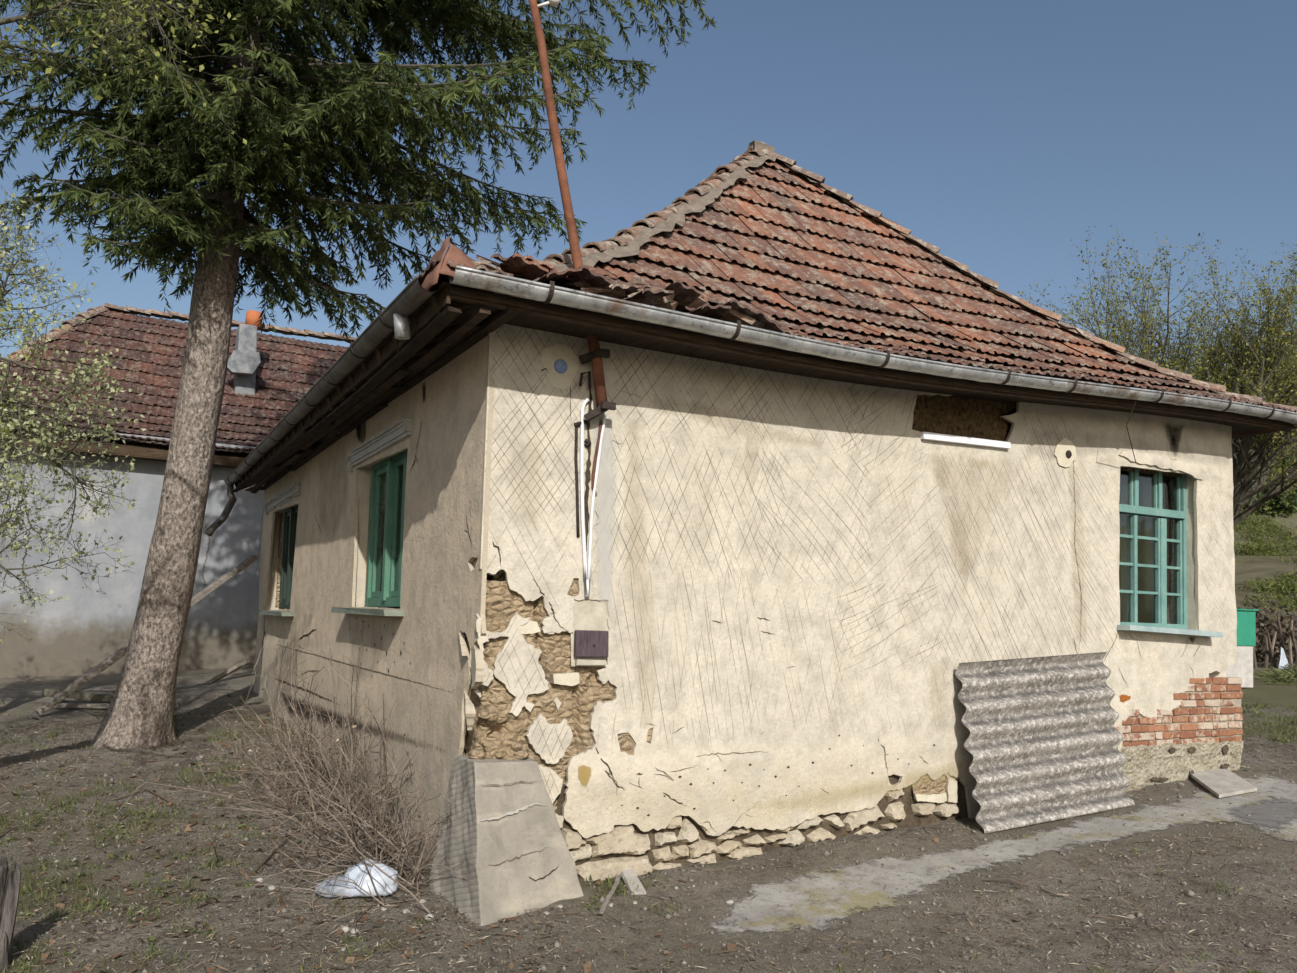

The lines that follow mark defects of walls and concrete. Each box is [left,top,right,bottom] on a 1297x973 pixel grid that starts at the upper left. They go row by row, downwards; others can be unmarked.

flaking render [458,542,615,828]
flaking render [1114,677,1243,769]